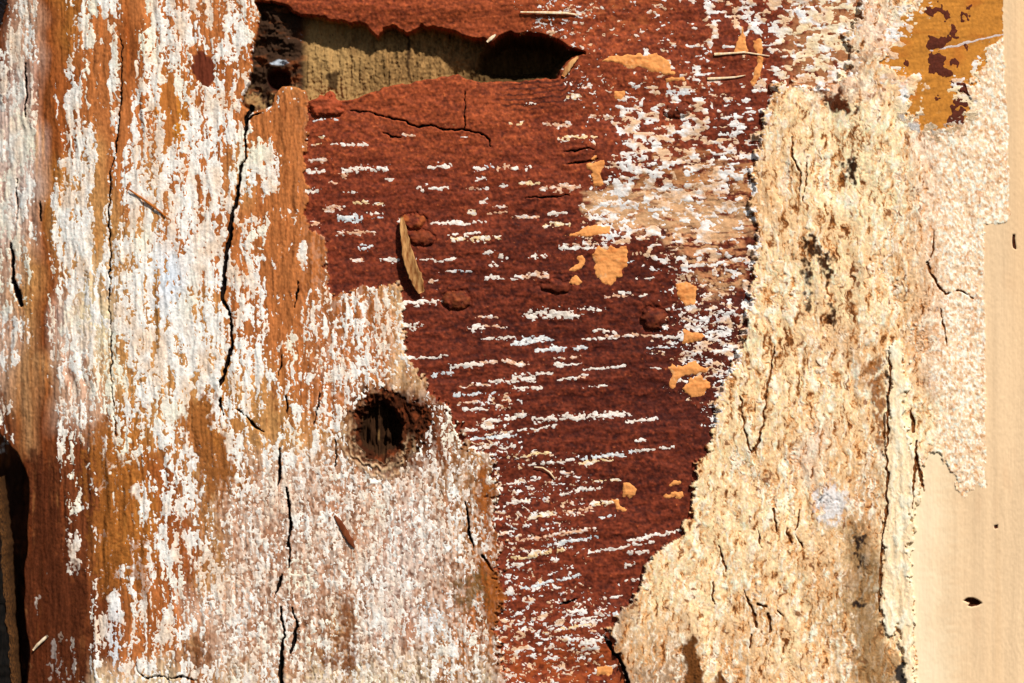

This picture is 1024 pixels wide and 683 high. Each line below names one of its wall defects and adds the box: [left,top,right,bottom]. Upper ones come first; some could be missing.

crack [22,63,30,117]
crack [350,92,491,147]
peeling [0,385,14,453]
peeling [0,0,41,379]
crack [10,179,42,307]
crack [219,105,299,683]
peeling [40,0,616,683]
peeling [612,482,637,512]
peeling [664,480,683,499]
peeling [565,0,1004,427]
crack [877,351,925,612]
crack [925,231,974,345]